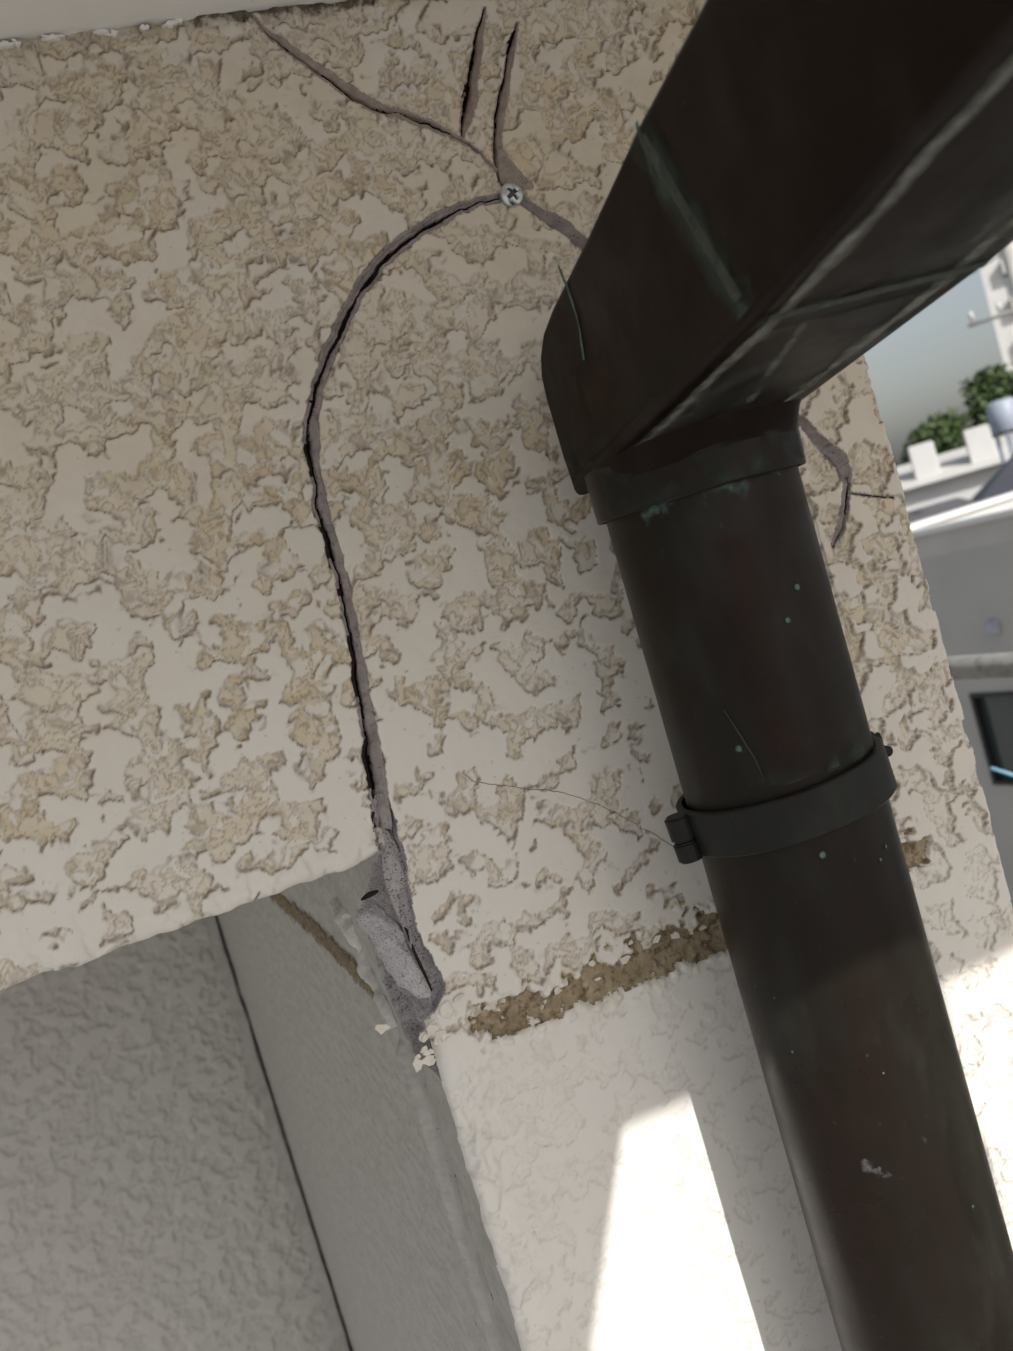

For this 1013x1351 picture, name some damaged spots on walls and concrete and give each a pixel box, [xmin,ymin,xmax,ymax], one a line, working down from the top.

crack [251,7,588,829]
crack [798,415,894,546]
spalling [270,791,727,1074]
crack [463,773,674,848]